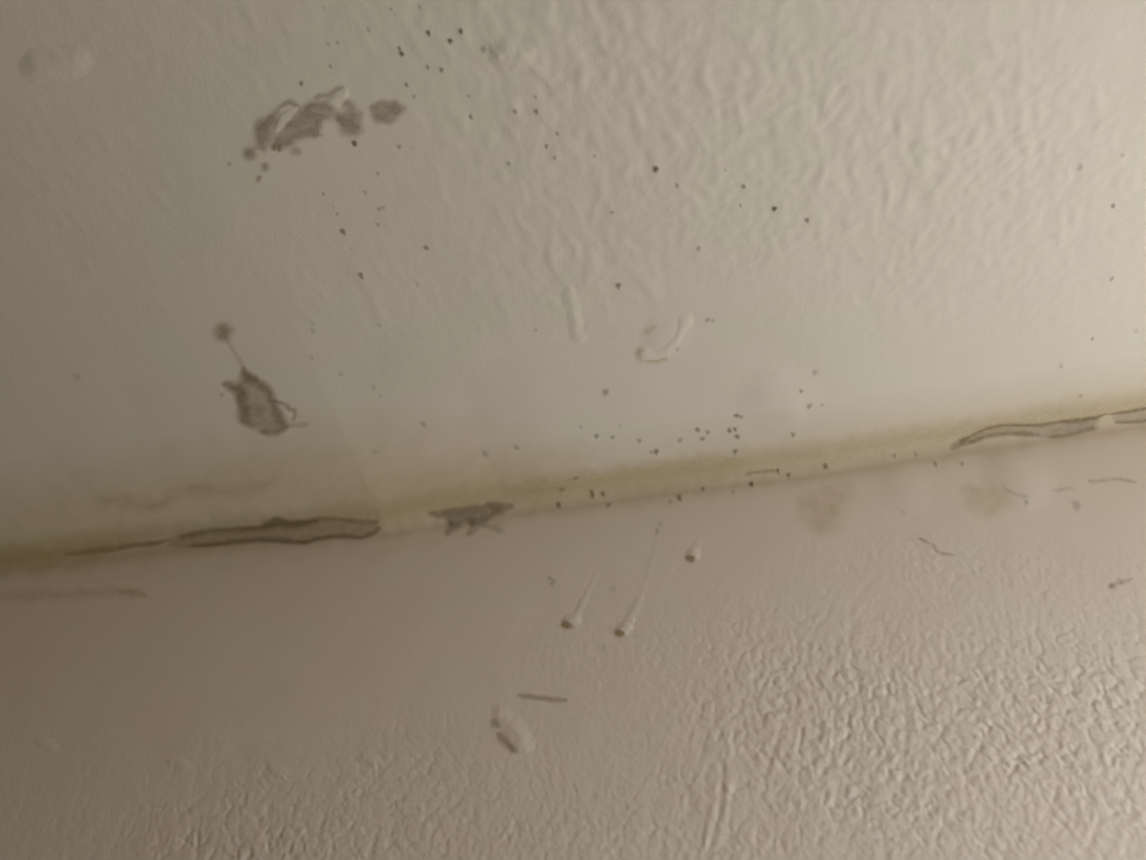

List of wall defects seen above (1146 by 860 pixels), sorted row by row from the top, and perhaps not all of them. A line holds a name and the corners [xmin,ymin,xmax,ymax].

crack [247,521,316,529]